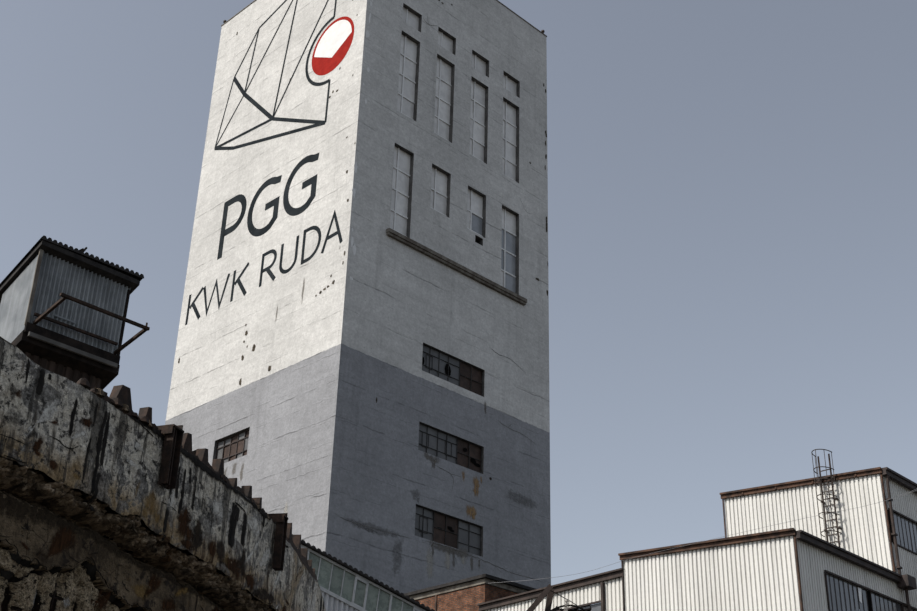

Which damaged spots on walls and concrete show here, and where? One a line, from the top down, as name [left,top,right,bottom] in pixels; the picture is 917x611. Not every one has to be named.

water stain [69,399,78,436]
water stain [81,403,165,514]
spalling [0,541,149,611]
crack [0,518,152,611]
rust [177,508,193,549]
water stain [163,447,268,576]
peeling [246,517,270,567]